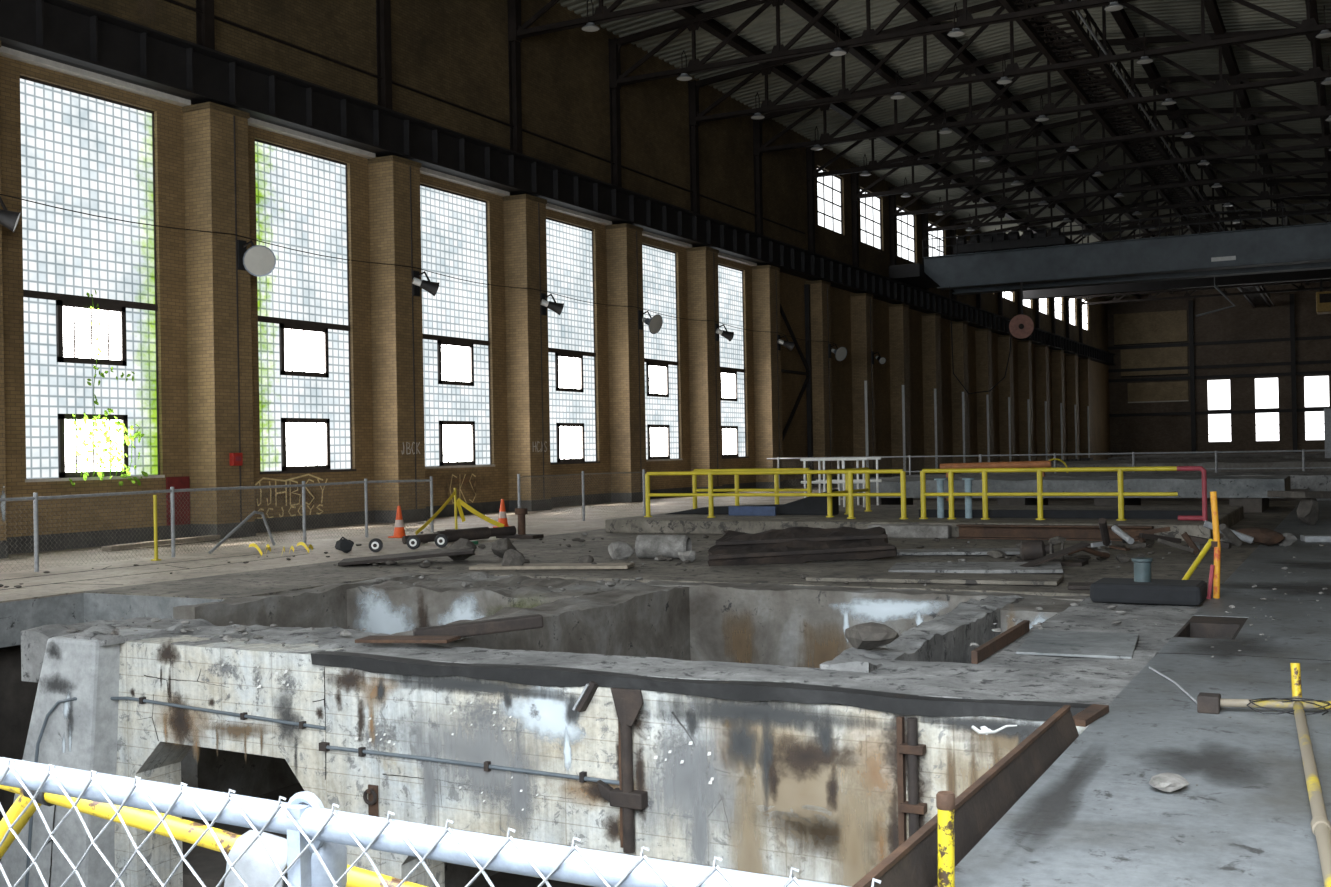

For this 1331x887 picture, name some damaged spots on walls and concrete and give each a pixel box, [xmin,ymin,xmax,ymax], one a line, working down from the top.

corrosion [163,697,206,752]
corrosion [633,710,648,730]
corrosion [568,742,619,802]
corrosion [635,748,645,791]
corrosion [957,750,1008,791]
corrosion [719,714,927,887]
corrosion [605,816,620,841]